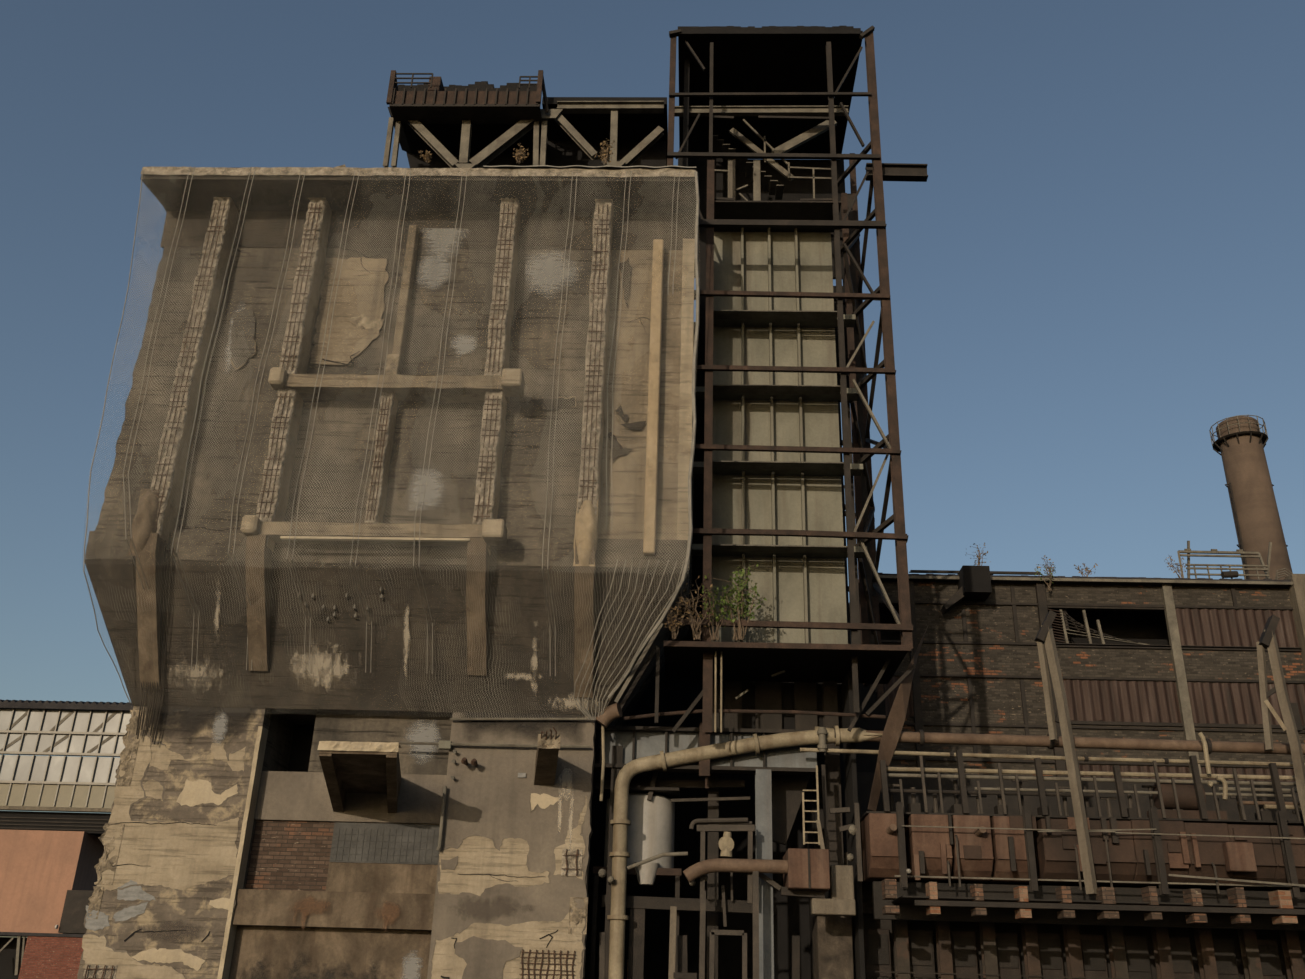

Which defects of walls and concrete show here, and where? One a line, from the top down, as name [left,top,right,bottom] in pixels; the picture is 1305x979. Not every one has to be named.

peeling [82,710,246,979]
peeling [437,793,587,896]
peeling [430,897,588,979]